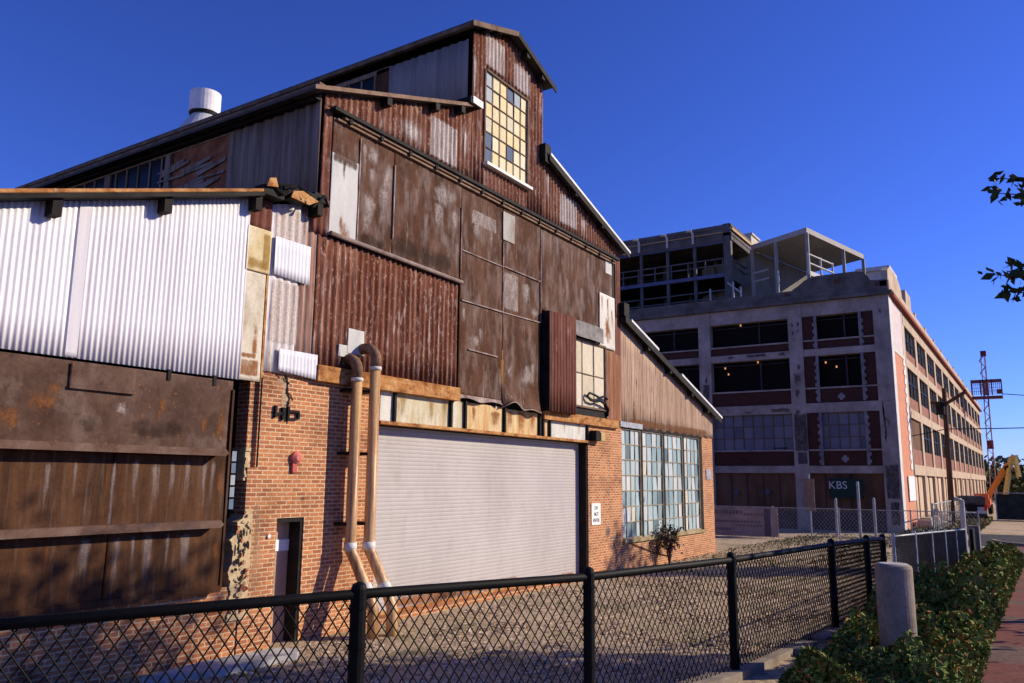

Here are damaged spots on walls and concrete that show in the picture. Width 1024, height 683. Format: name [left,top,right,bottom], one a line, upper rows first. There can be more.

crack [276,374,293,423]
spalling [222,509,253,621]